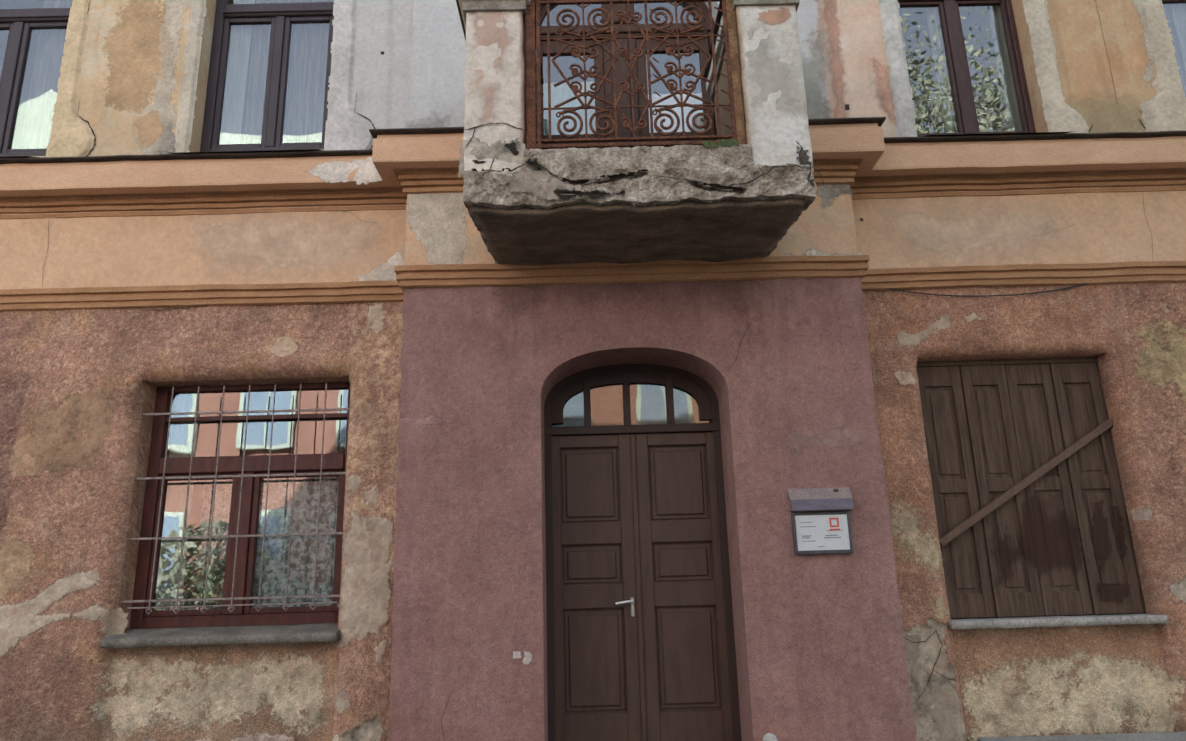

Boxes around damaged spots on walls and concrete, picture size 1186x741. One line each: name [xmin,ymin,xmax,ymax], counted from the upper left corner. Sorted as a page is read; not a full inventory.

peeling [103,0,190,155]
peeling [309,157,382,185]
crack [465,123,557,177]
crack [653,140,824,190]
spalling [796,146,812,165]
peeling [338,474,394,663]
flaking render [0,538,384,741]
peeling [513,651,532,665]
flaking render [888,495,1186,741]